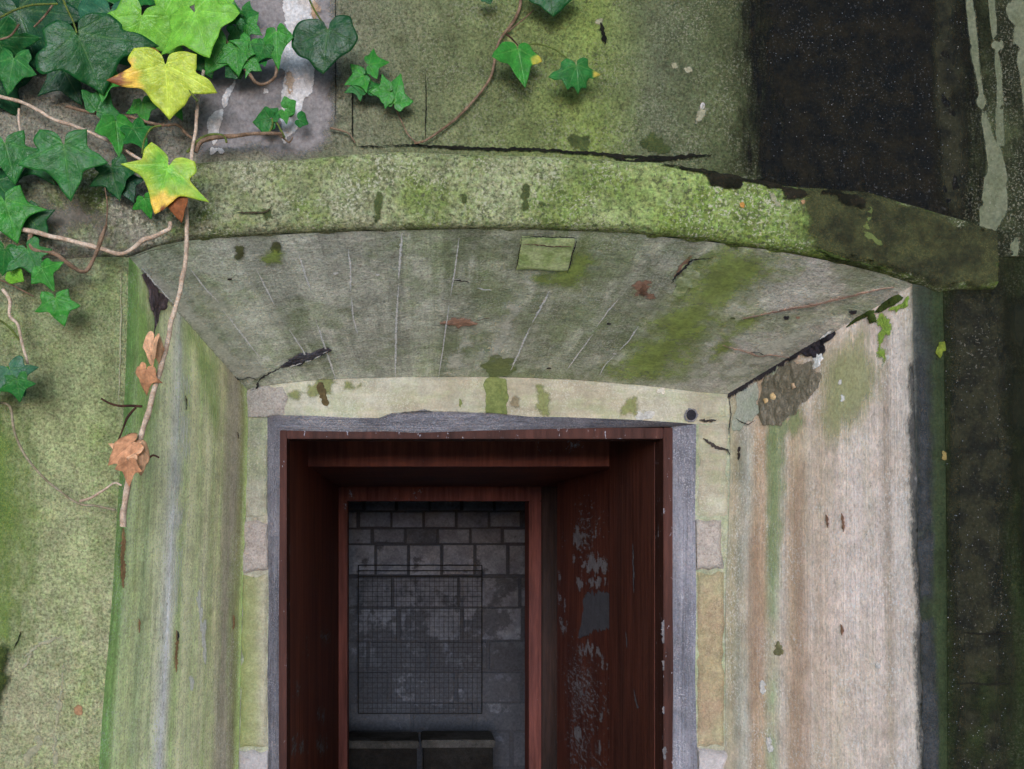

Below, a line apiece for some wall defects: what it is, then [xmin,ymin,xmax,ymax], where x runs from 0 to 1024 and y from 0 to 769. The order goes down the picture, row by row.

crack [335,62,712,162]
rust [631,280,656,300]
crack [235,348,332,391]
spalling [757,359,821,447]
crack [700,287,894,454]
damp [742,0,1024,769]
peeling [557,495,609,769]